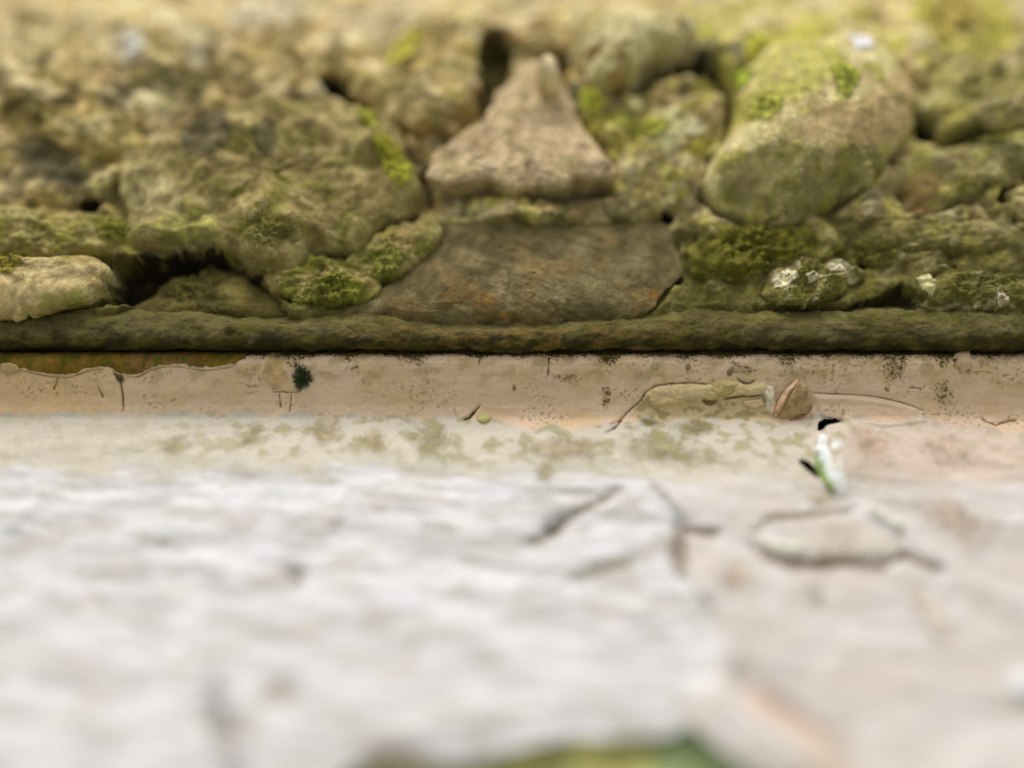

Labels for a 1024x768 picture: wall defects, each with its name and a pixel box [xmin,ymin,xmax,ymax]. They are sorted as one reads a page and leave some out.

peeling [0,350,249,378]
peeling [764,379,813,420]